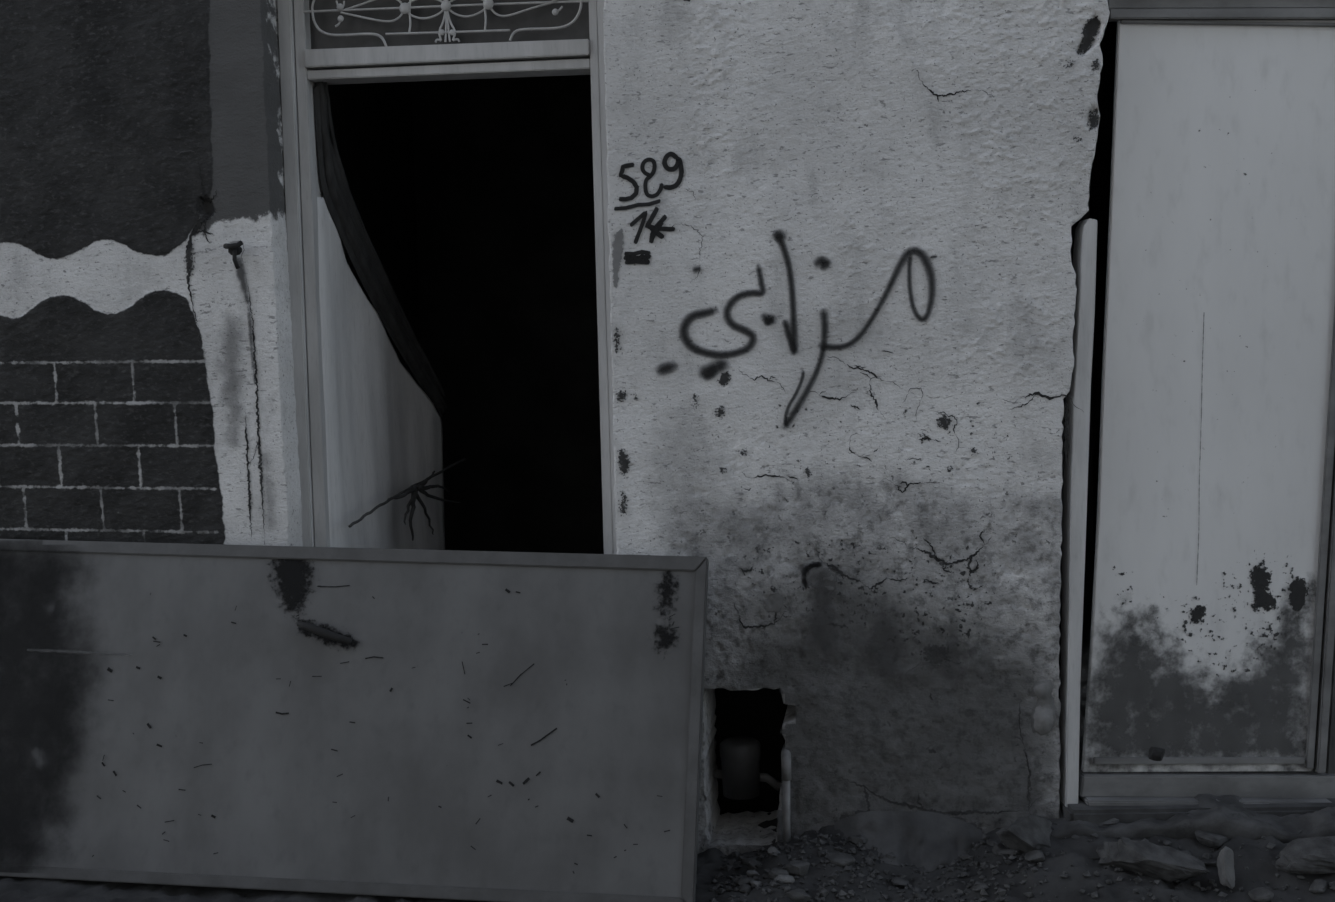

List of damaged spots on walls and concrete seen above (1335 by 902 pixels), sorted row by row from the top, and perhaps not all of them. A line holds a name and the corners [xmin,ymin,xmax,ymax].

crack [918,72,993,102]
crack [1003,391,1079,465]
crack [816,531,992,593]